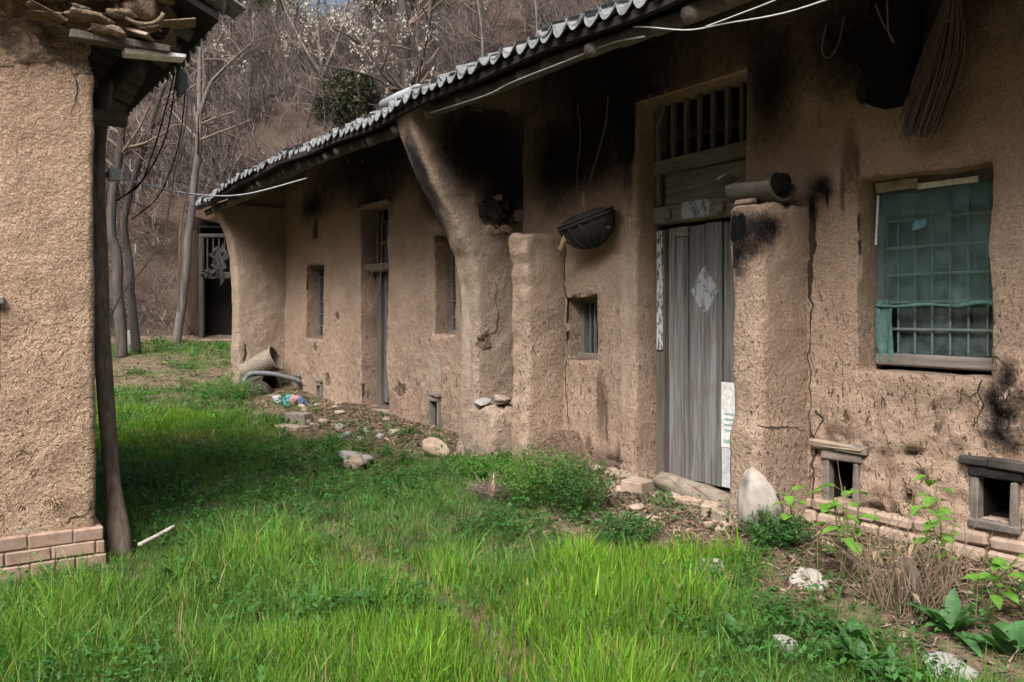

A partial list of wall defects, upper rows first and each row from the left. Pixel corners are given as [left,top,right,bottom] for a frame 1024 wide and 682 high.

leakage [732,218,780,269]
spalling [474,329,492,350]
crack [757,187,830,499]
leakage [986,363,1013,406]
crack [959,379,984,444]
leakage [991,419,1024,448]